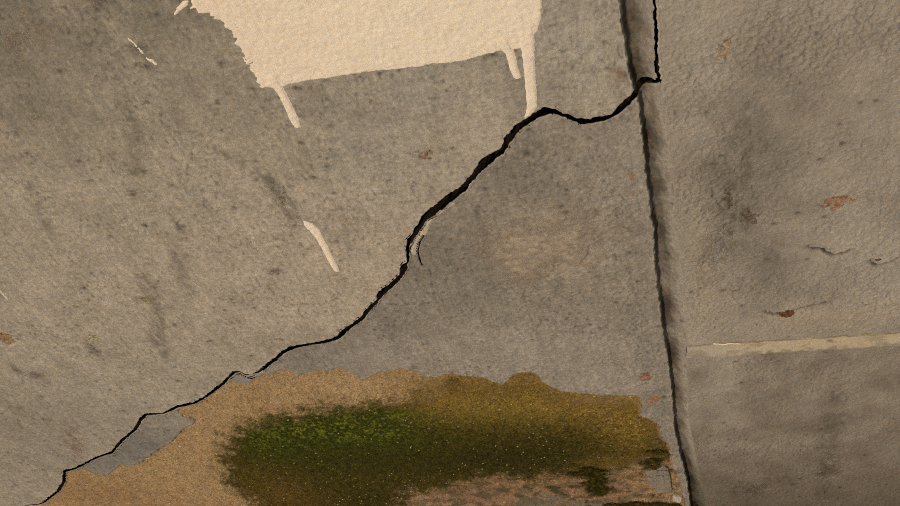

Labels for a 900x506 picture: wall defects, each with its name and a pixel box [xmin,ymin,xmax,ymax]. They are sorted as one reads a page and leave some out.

crack [22,0,664,506]
peeling [767,297,834,318]
spalling [820,194,857,210]
peeling [37,367,685,506]